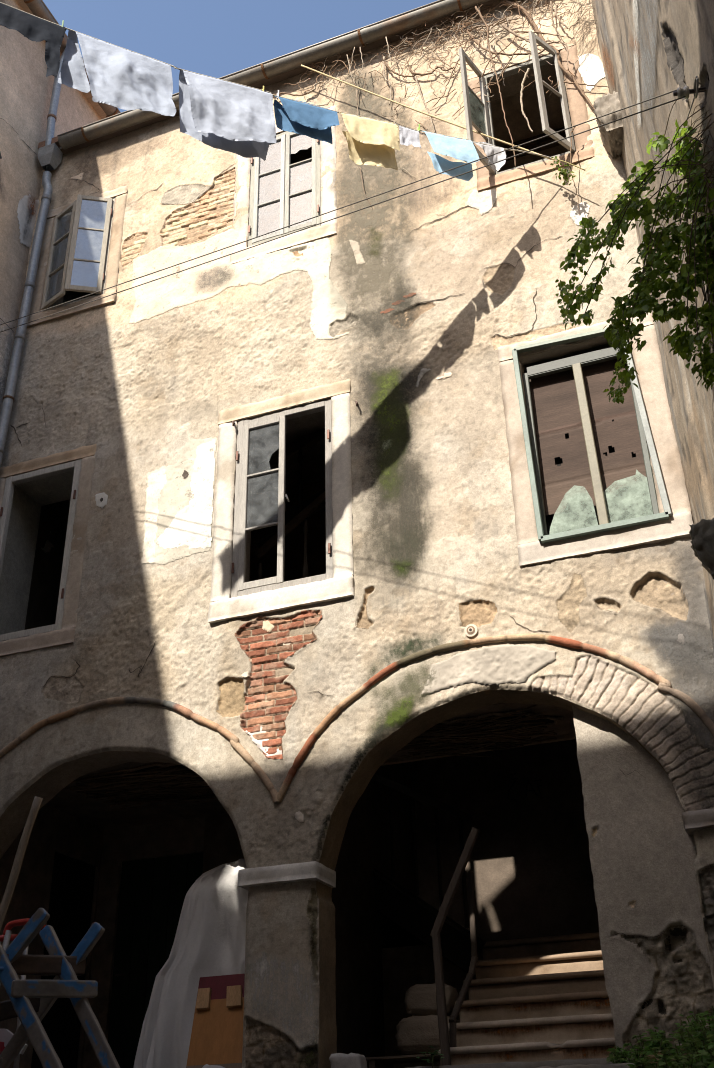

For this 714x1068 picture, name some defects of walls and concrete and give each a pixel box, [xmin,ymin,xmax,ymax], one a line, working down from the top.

water stain [340,74,409,131]
peeling [578,53,606,91]
peeling [120,167,359,340]
water stain [335,141,447,579]
peeling [141,437,217,565]
spalling [355,586,374,629]
spalling [556,571,689,633]
flaking render [216,610,322,759]
flaking render [421,599,714,811]
spalling [621,864,714,1058]
spalling [244,1016,318,1068]